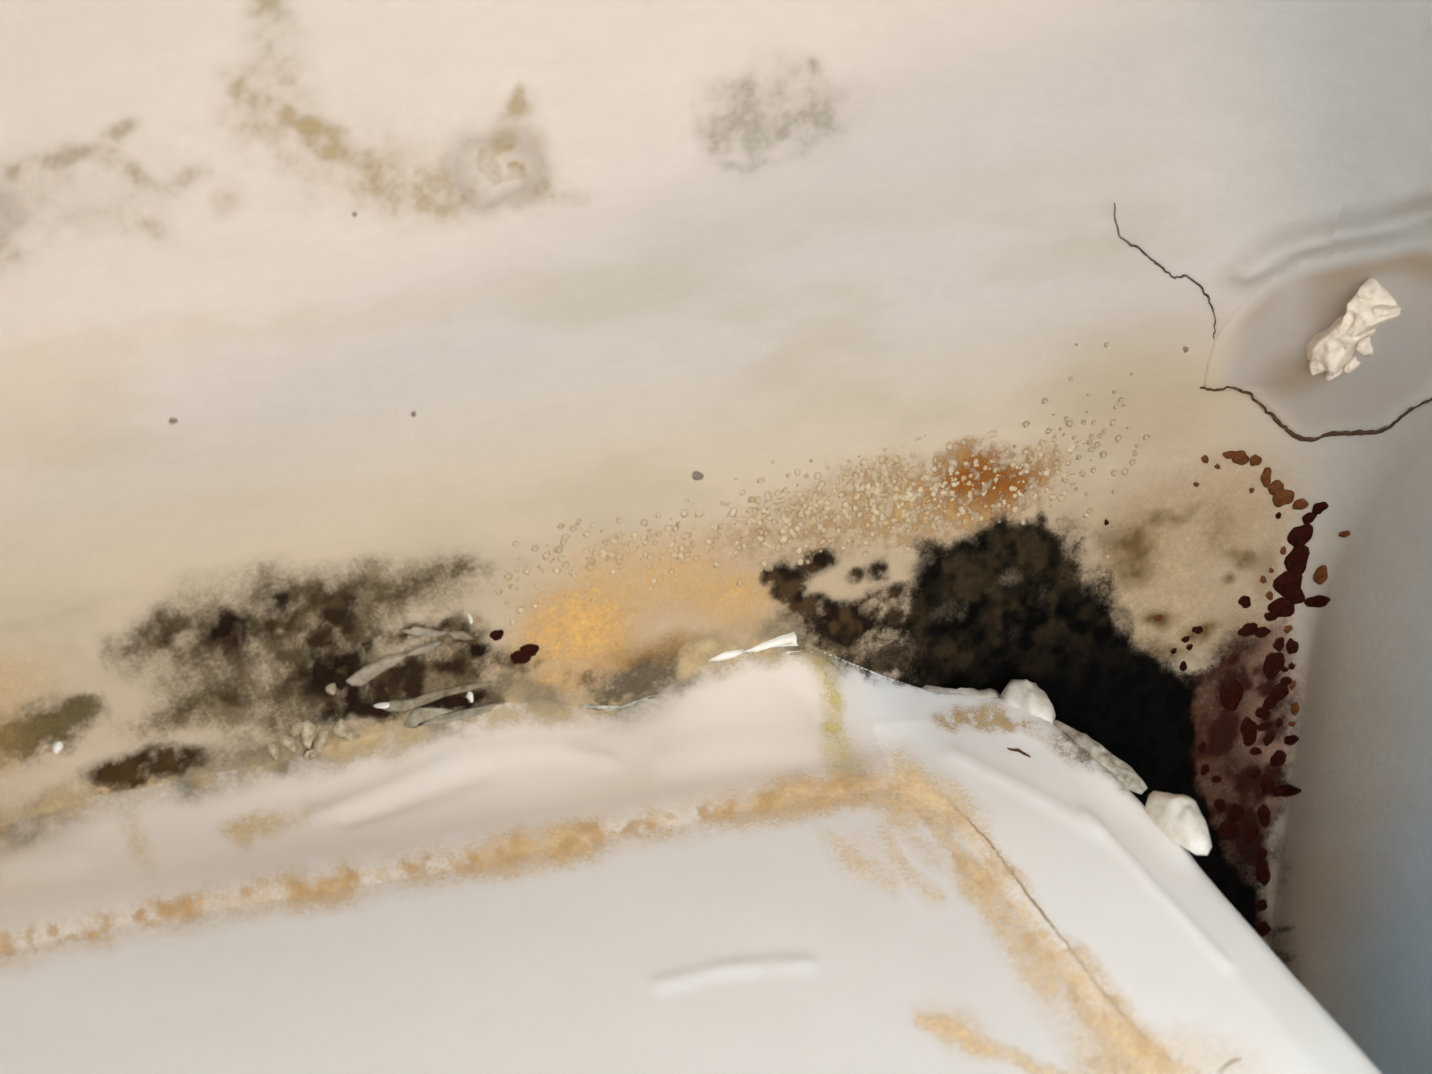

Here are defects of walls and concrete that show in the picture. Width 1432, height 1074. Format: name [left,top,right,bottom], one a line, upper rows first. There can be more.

leakage [283,108,347,159]
crack [1114,203,1216,339]
crack [1200,386,1432,442]
spalling [268,718,361,761]
peeling [326,613,474,695]
peeling [373,681,501,729]
leakage [0,390,1330,978]
corrosion [1179,619,1299,932]
leakage [698,766,1187,1074]